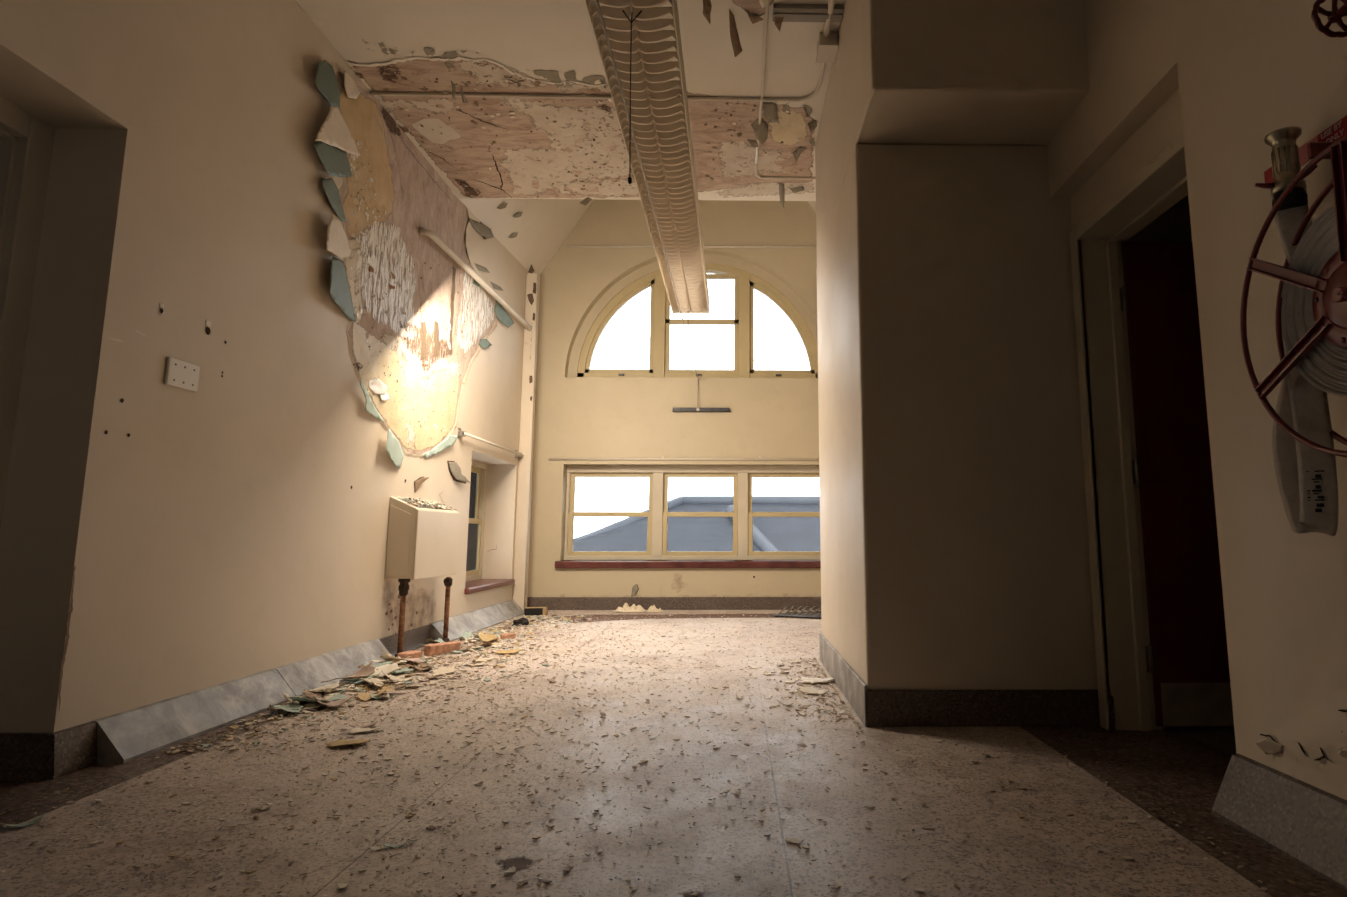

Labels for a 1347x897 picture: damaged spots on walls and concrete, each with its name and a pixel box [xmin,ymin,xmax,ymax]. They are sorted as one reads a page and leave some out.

peeling [703,0,712,24]
peeling [729,0,784,57]
peeling [677,92,817,209]
peeling [314,41,640,493]